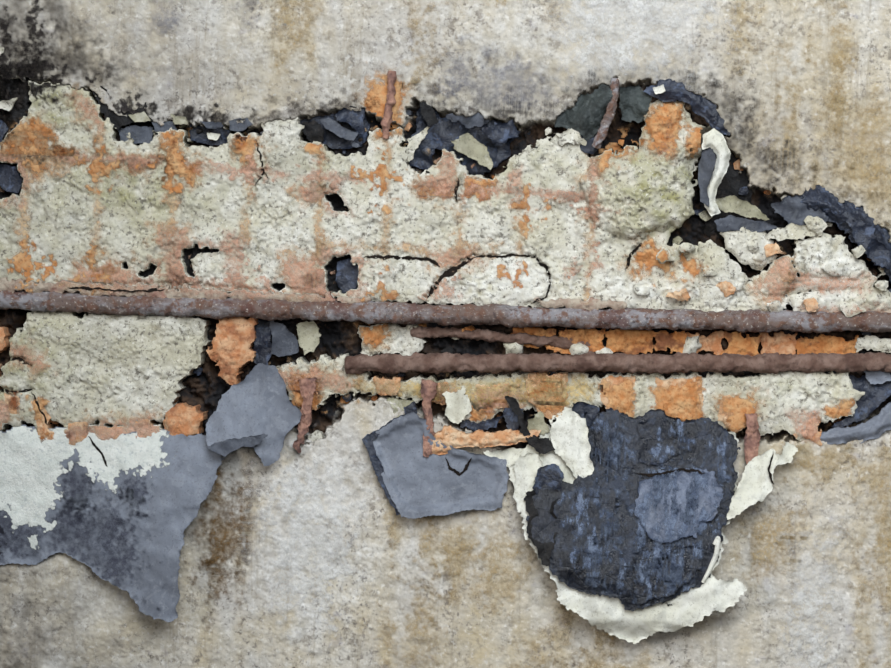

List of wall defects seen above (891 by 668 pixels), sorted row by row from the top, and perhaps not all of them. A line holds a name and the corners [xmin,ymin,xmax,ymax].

damp [0,0,67,90]
damp [110,94,156,116]
corrosion [0,74,705,302]
spalling [0,80,891,357]
crack [365,253,551,303]
corrosion [354,321,390,349]
corrosion [278,363,636,422]
corrosion [649,376,706,421]
peeling [0,311,891,644]